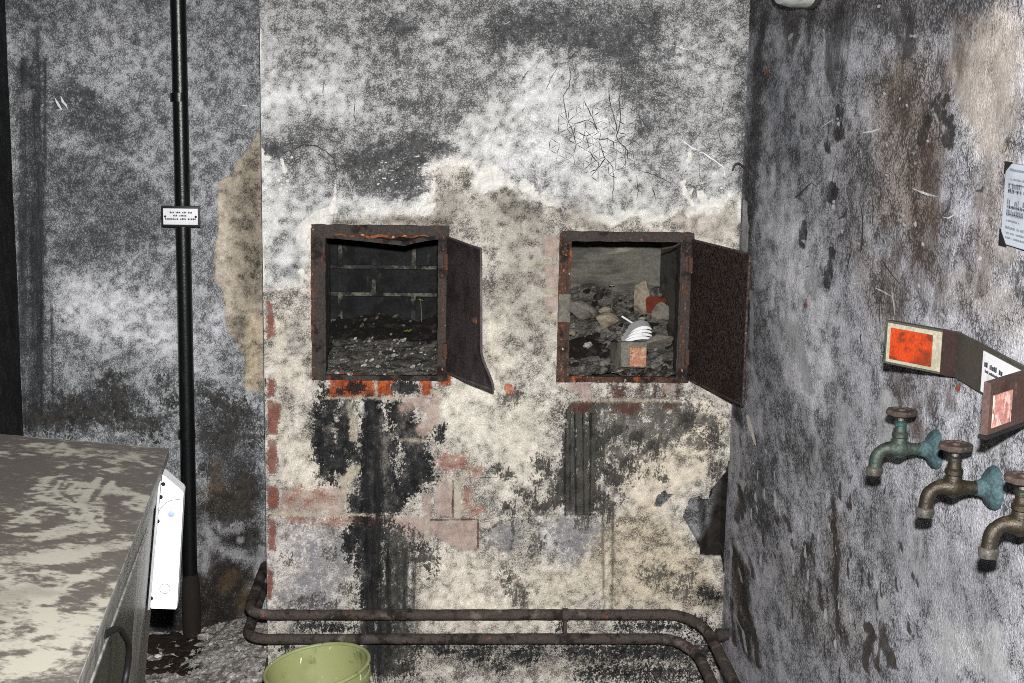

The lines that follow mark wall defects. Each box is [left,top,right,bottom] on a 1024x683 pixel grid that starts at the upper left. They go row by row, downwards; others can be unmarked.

crack [521,52,671,201]
damp [827,181,839,204]
damp [799,219,807,249]
damp [805,247,836,295]
flaking render [211,125,488,552]
rust [318,372,451,400]
damp [877,389,893,444]
damp [194,371,731,683]
spalling [652,415,901,683]